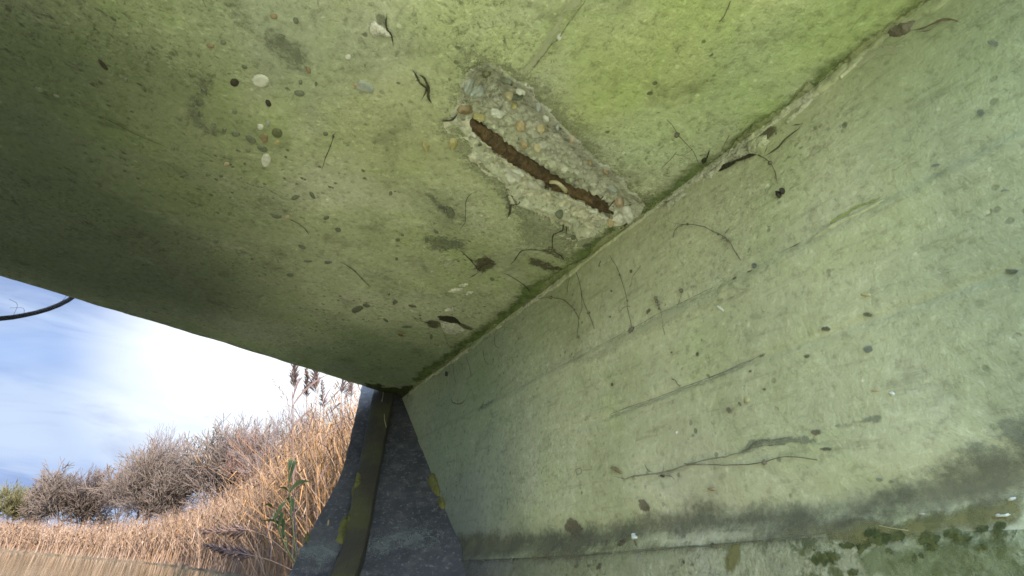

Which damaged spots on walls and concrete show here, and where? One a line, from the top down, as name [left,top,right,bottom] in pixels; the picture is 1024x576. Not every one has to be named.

spalling [436,51,652,247]
leakage [458,461,1024,560]